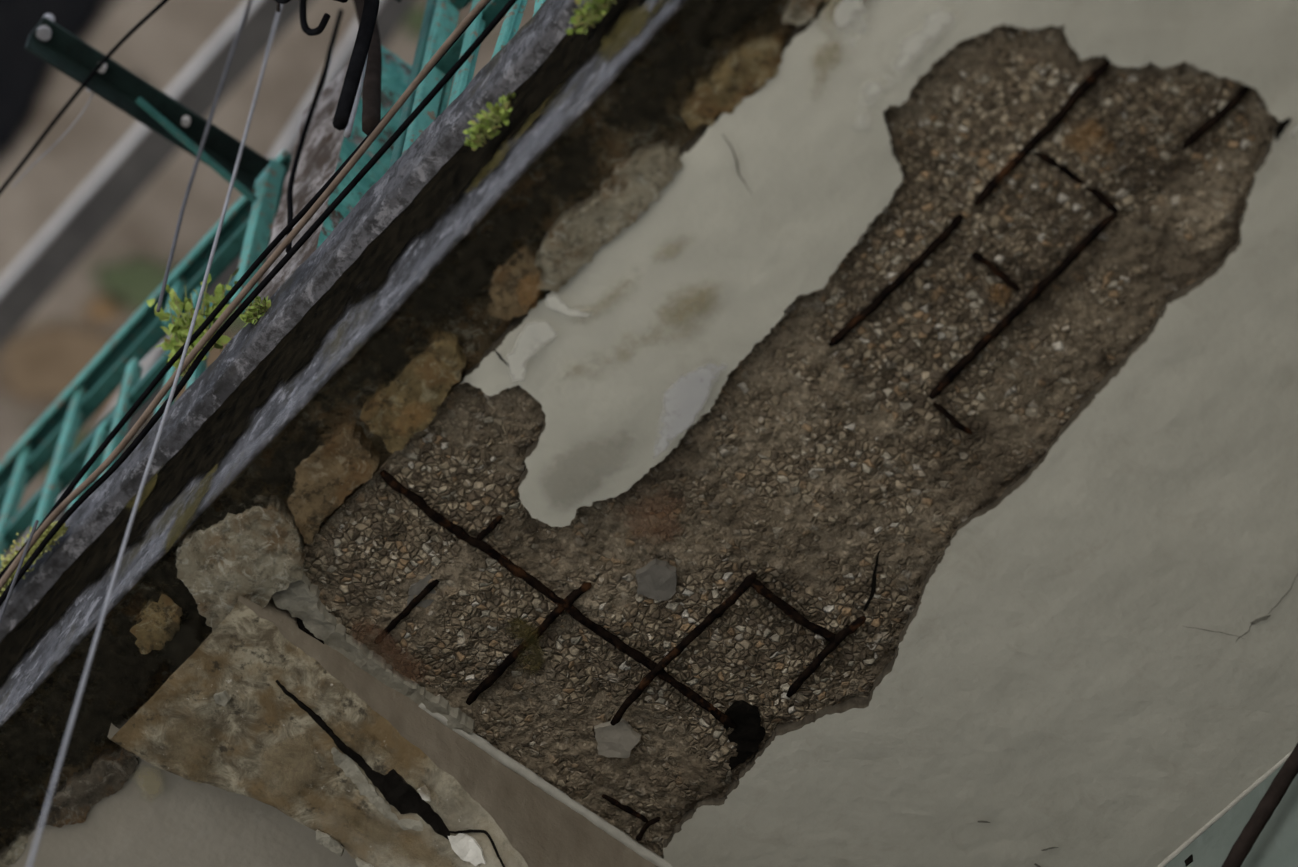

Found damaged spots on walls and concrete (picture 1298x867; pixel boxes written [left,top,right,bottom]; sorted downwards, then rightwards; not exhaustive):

spalling [271,24,1278,857]
peeling [316,830,374,867]
crack [275,680,505,867]
peeling [448,833,486,866]